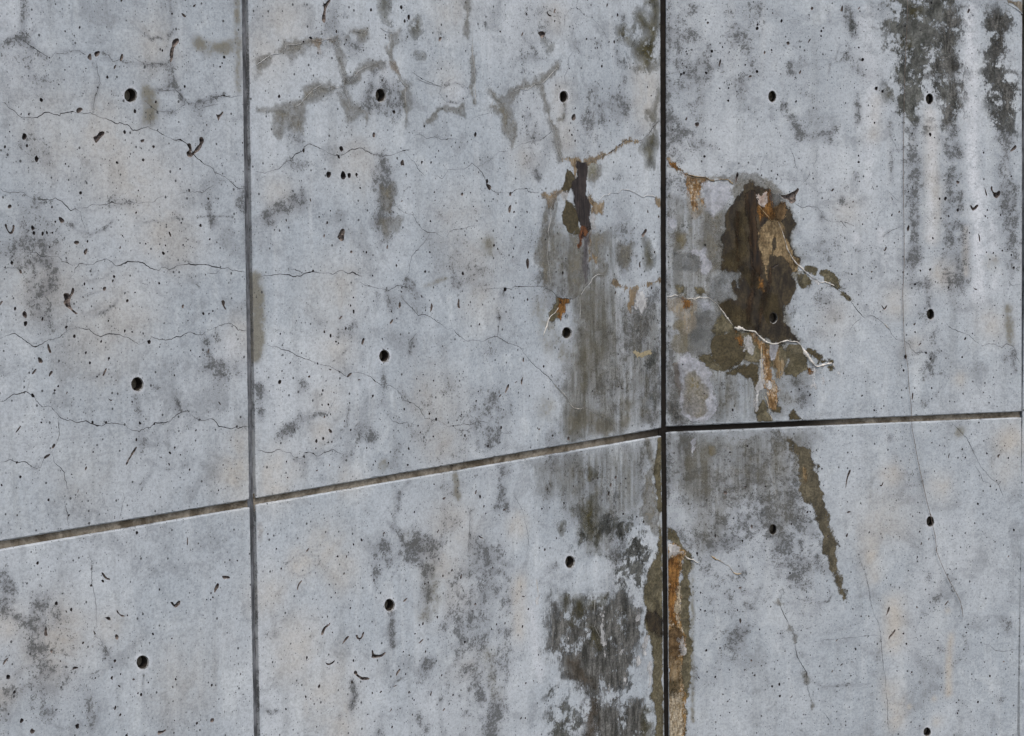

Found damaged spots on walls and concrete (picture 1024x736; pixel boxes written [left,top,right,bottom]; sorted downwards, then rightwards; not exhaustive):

crack [0,39,243,220]
crack [262,73,658,193]
rust [667,158,712,215]
spalling [781,188,799,203]
water stain [881,0,964,131]
water stain [981,0,1023,133]
crack [10,214,613,426]
water stain [667,174,851,601]
crack [0,388,247,525]
water stain [536,437,699,736]
rust [668,543,687,736]